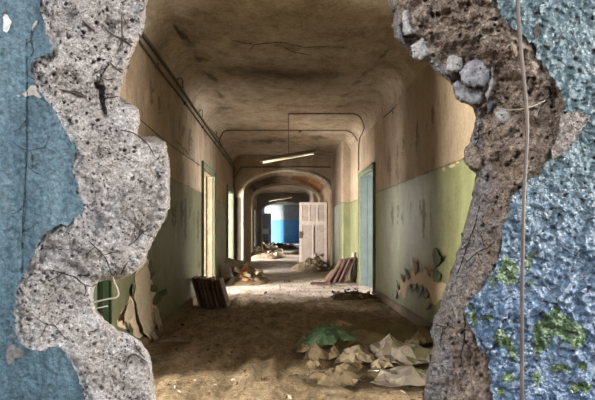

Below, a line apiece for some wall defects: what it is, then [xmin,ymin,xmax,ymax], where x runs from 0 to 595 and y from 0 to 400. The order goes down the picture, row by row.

crack [232,40,330,55]
spalling [6,0,171,400]
spalling [388,0,566,400]
crack [86,226,153,275]
crack [456,206,497,275]
crack [48,270,92,296]
peeling [530,307,589,356]
peeling [550,362,587,373]
peeling [568,382,592,395]